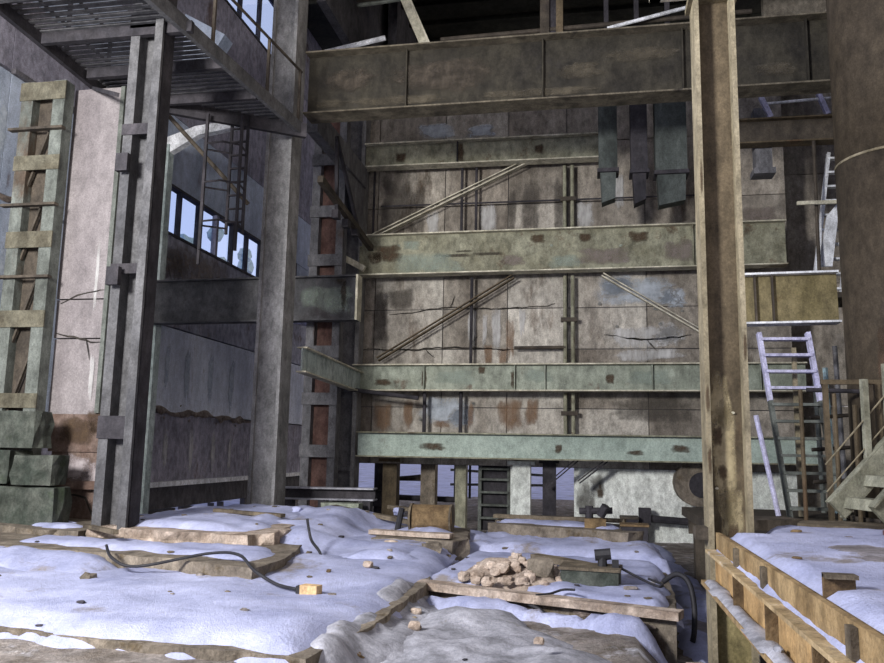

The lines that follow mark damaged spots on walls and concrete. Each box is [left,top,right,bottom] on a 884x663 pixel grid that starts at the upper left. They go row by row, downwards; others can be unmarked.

crack [60,290,101,304]
crack [56,333,94,357]
corrosion [404,404,412,425]
corrosion [498,401,537,426]